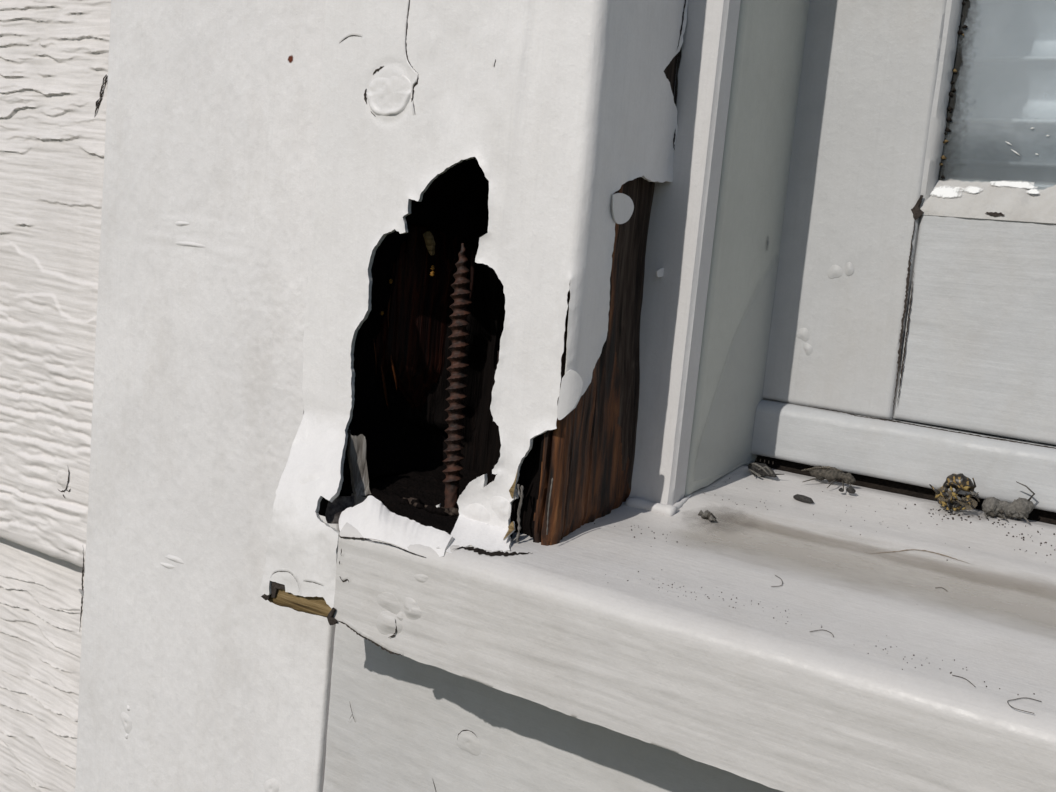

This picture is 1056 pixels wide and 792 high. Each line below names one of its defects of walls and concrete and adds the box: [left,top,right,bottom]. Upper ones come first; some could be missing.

peeling [664,0,686,105]
peeling [456,177,664,556]
peeling [325,496,354,524]
spalling [261,581,338,625]